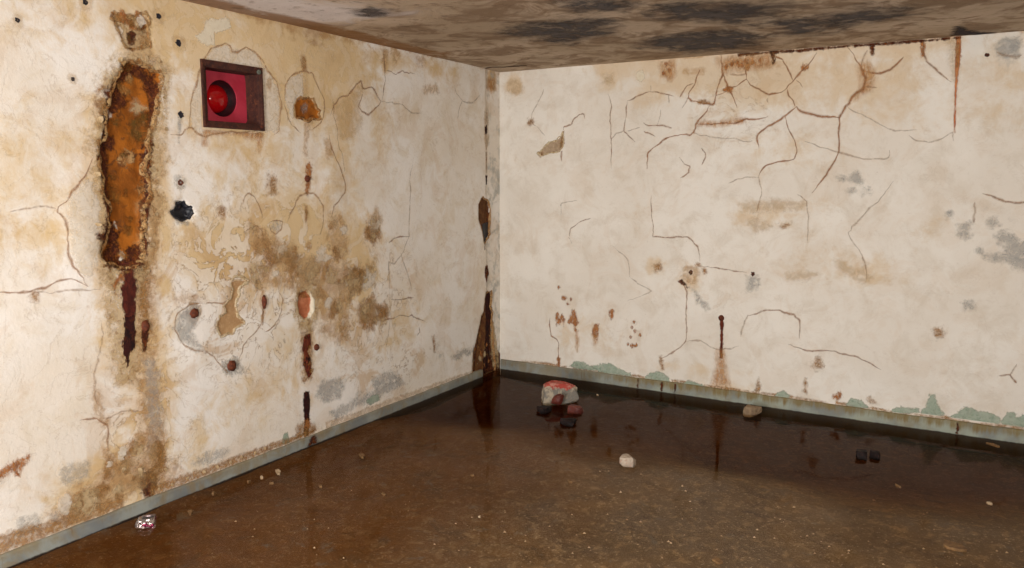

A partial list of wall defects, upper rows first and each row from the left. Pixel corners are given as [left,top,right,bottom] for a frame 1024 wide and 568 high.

spalling [92,10,325,288]
mould [500,0,631,44]
mould [642,2,908,53]
crack [610,45,951,193]
corrosion [724,36,961,130]
leakage [951,26,994,36]
crack [5,163,101,293]
spalling [478,196,491,250]
corrosion [105,258,149,384]
spalling [175,267,320,373]
crack [749,310,881,370]
corrosion [138,332,317,498]